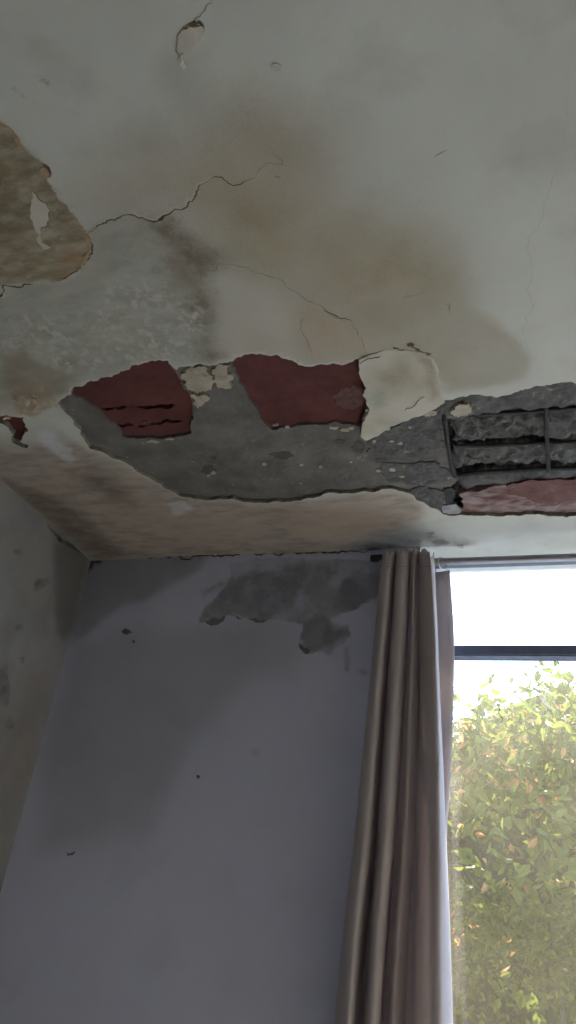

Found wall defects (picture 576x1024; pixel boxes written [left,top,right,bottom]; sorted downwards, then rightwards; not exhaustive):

peeling [0,120,95,285]
crack [86,149,287,234]
crack [213,262,365,351]
leakage [354,265,537,396]
flaking render [0,415,28,448]
flaking render [58,354,576,517]
leakage [0,383,464,676]